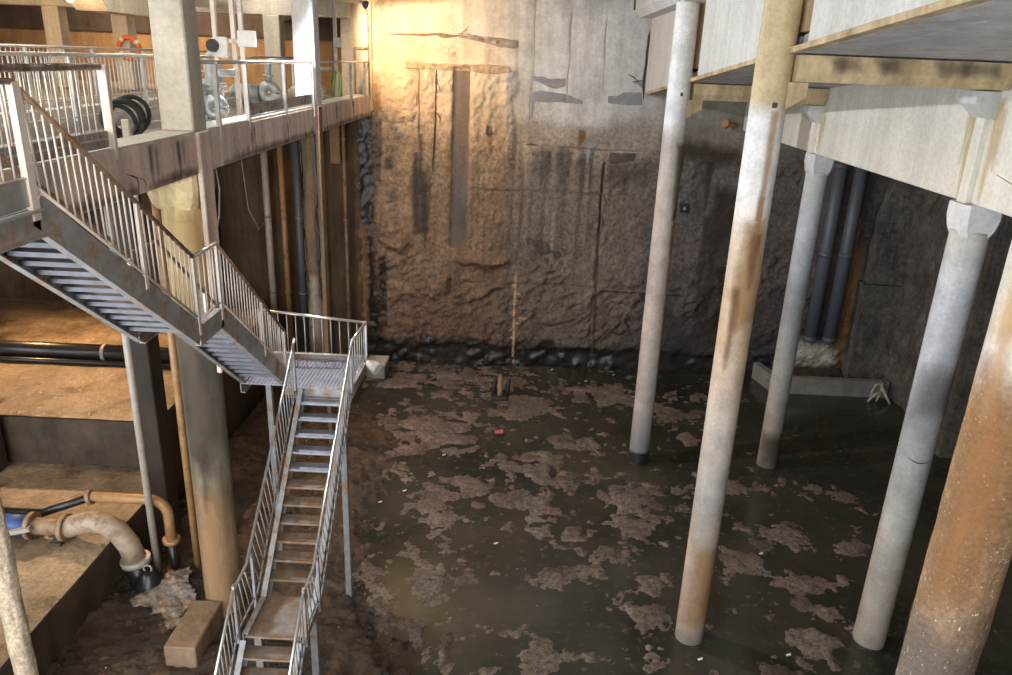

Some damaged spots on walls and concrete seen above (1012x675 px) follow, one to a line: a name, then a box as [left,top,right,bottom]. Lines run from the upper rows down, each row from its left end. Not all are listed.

leakage [336,102,640,370]
corrosion [729,113,777,339]
leakage [658,353,714,374]
corrosion [688,551,716,620]